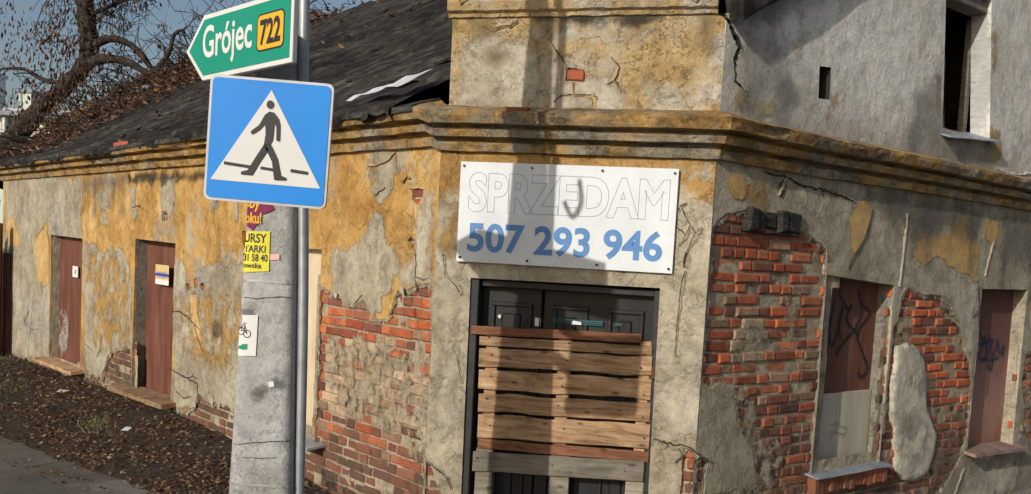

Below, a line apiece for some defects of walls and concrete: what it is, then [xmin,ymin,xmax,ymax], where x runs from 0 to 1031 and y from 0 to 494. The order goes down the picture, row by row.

crack [719,13,750,107]
peeling [4,175,139,388]
peeling [161,176,176,221]
peeling [170,202,246,439]
spalling [305,150,466,494]
crack [763,169,873,269]
spalling [653,172,1018,494]
spalling [1007,346,1031,439]